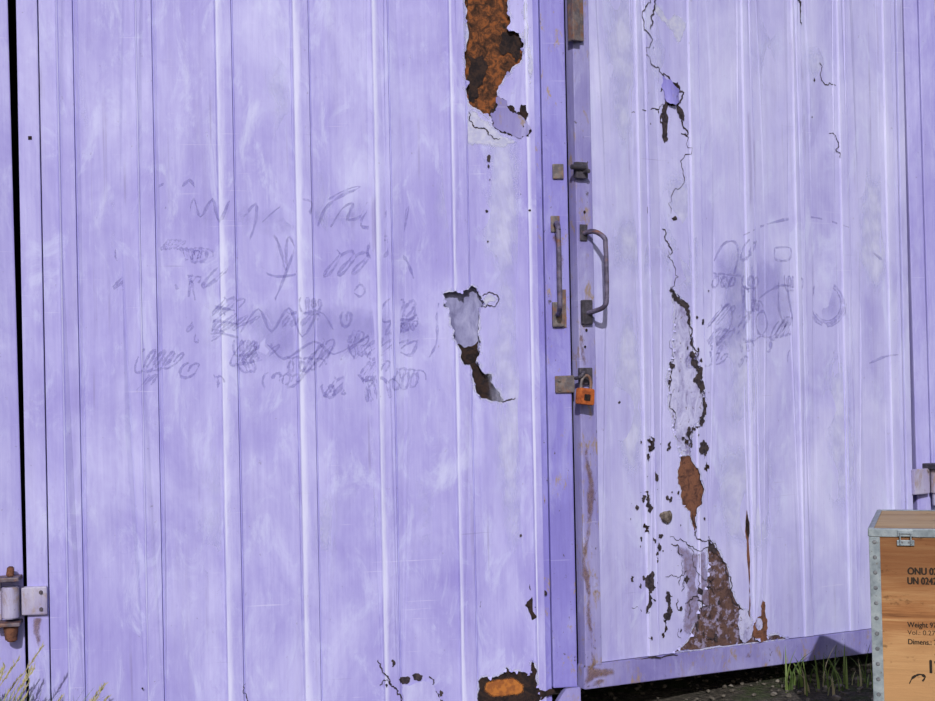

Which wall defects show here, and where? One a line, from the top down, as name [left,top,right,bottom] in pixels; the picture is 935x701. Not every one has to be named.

peeling [483,96,531,138]
crack [633,0,692,299]
peeling [640,288,709,471]
peeling [630,472,680,520]
peeling [631,523,749,642]
rust [672,450,789,653]
rust [477,659,556,701]